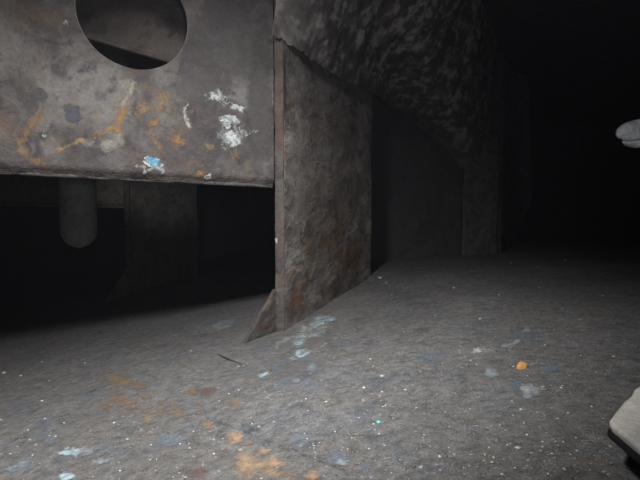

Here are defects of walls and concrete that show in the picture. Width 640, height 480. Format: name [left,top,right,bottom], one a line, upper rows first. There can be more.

damp [180,0,274,157]
peeling [142,156,164,175]